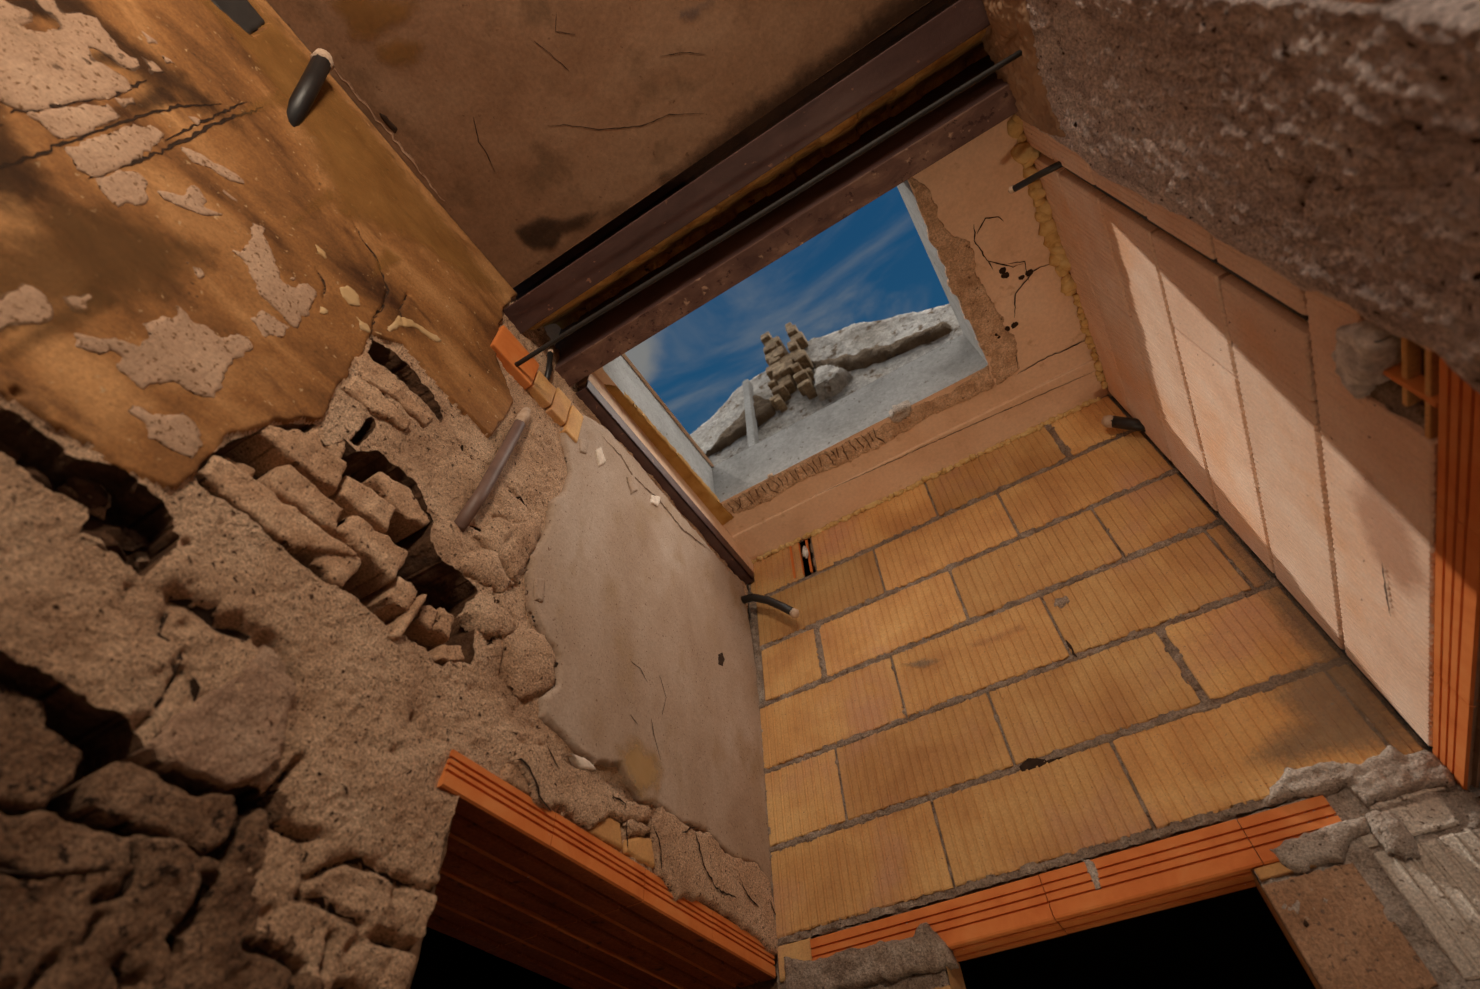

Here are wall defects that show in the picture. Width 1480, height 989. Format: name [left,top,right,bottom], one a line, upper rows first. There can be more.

peeling [0,0,245,216]
crack [0,80,263,179]
spalling [379,113,397,133]
peeling [0,284,92,332]
spalling [74,223,464,665]
water stain [518,216,589,248]
spalling [723,177,1020,513]
crack [810,341,1095,498]
crack [974,216,1049,318]
spalling [999,267,1033,280]
peeling [524,415,772,885]
spalling [0,645,297,881]